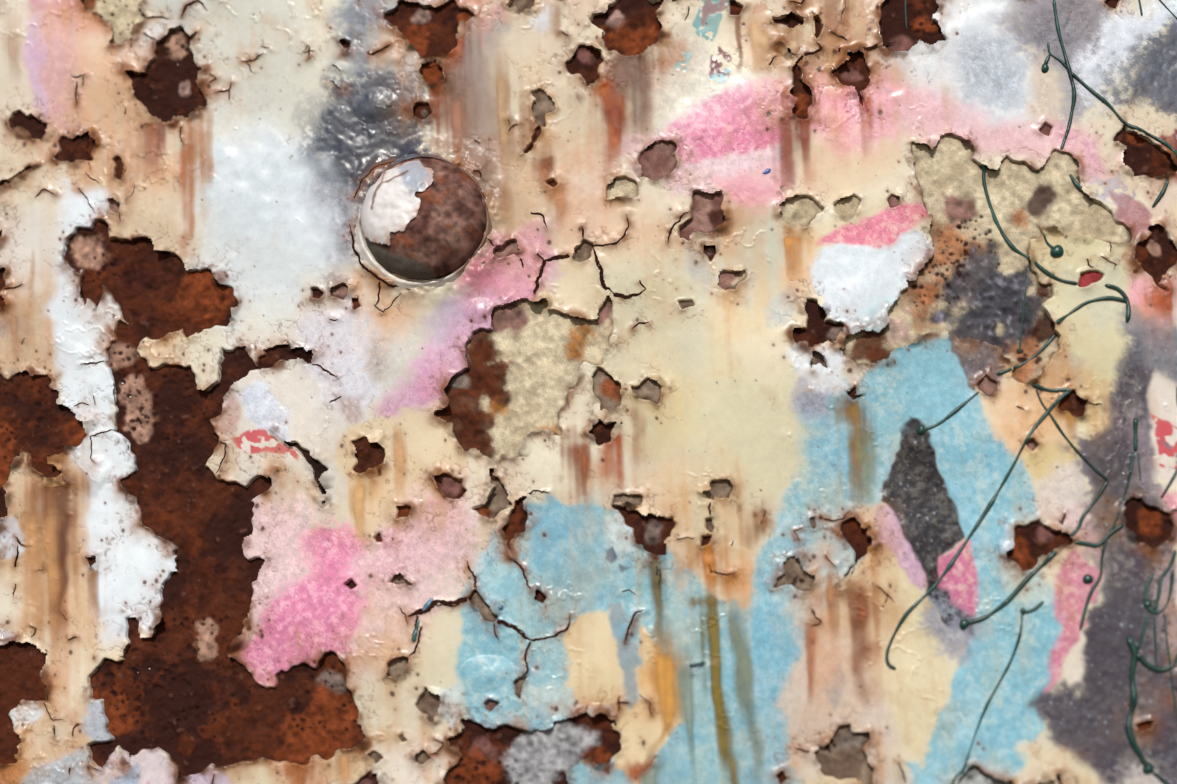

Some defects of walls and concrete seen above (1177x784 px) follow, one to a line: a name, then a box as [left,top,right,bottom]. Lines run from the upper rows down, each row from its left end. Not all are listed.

corrosion [121,20,211,197]
crack [520,212,648,329]
peeling [809,129,1131,390]
peeling [427,290,667,525]
peeling [978,376,999,397]
corrosion [0,362,99,614]
corrosion [64,221,385,784]
corrosion [0,633,53,774]
crack [400,561,477,656]
crack [514,560,531,588]
crack [493,613,571,676]
corrosion [428,702,649,784]